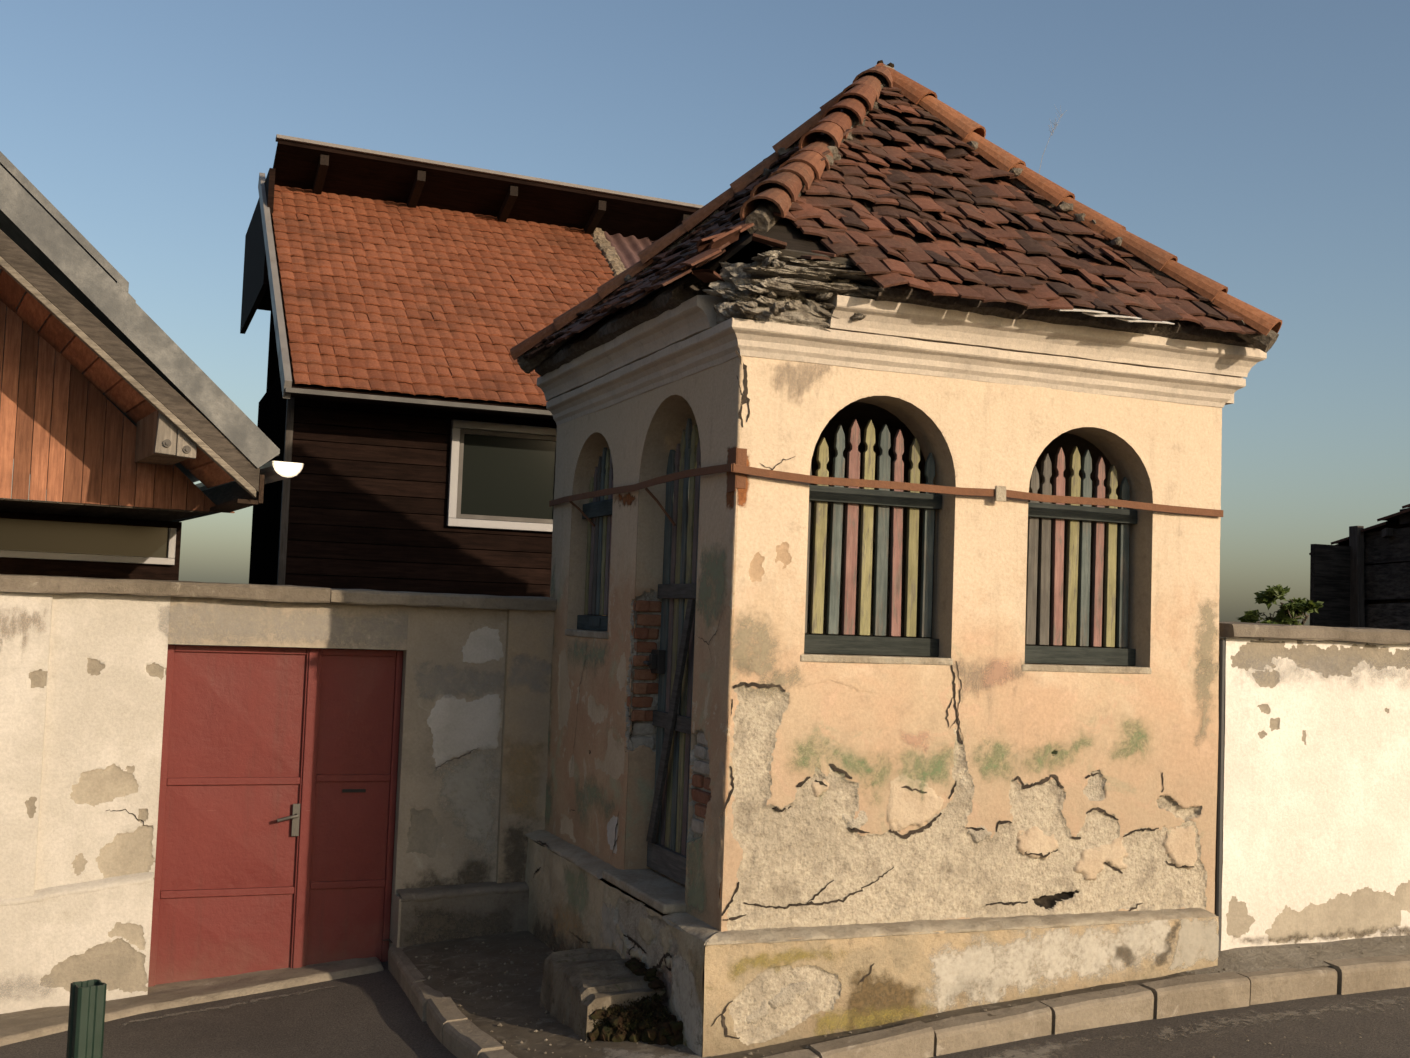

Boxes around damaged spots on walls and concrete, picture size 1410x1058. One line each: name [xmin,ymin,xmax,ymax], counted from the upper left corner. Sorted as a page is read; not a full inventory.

peeling [692,233,885,321]
rust [726,447,750,508]
flaking render [569,590,662,780]
crack [946,659,964,739]
peeling [70,763,155,909]
spalling [687,682,1207,931]
peeling [39,922,148,993]
spalling [615,897,679,1009]
peeling [1226,880,1410,944]
spalling [729,964,842,1045]